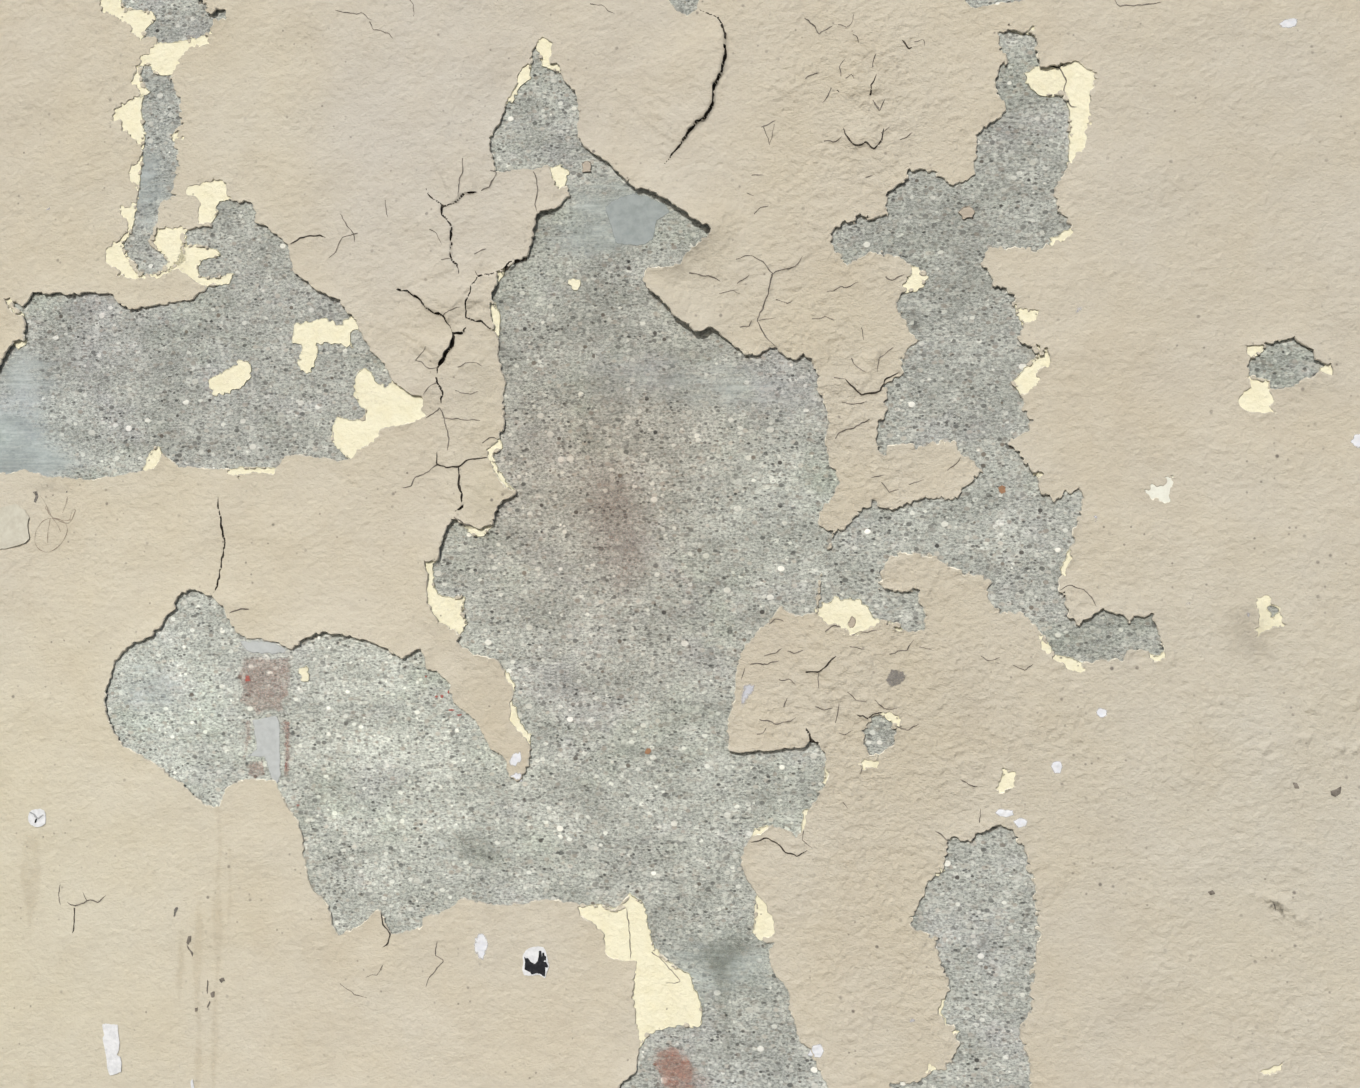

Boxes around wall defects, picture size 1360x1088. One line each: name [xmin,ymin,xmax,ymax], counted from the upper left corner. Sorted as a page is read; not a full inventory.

peeling [669,0,699,16]
peeling [965,0,1022,8]
crack [664,10,727,164]
peeling [0,0,426,480]
crack [398,158,527,526]
peeling [1238,336,1334,414]
crack [215,501,249,613]
peeling [103,23,1166,1088]
spalling [1260,1061,1285,1075]